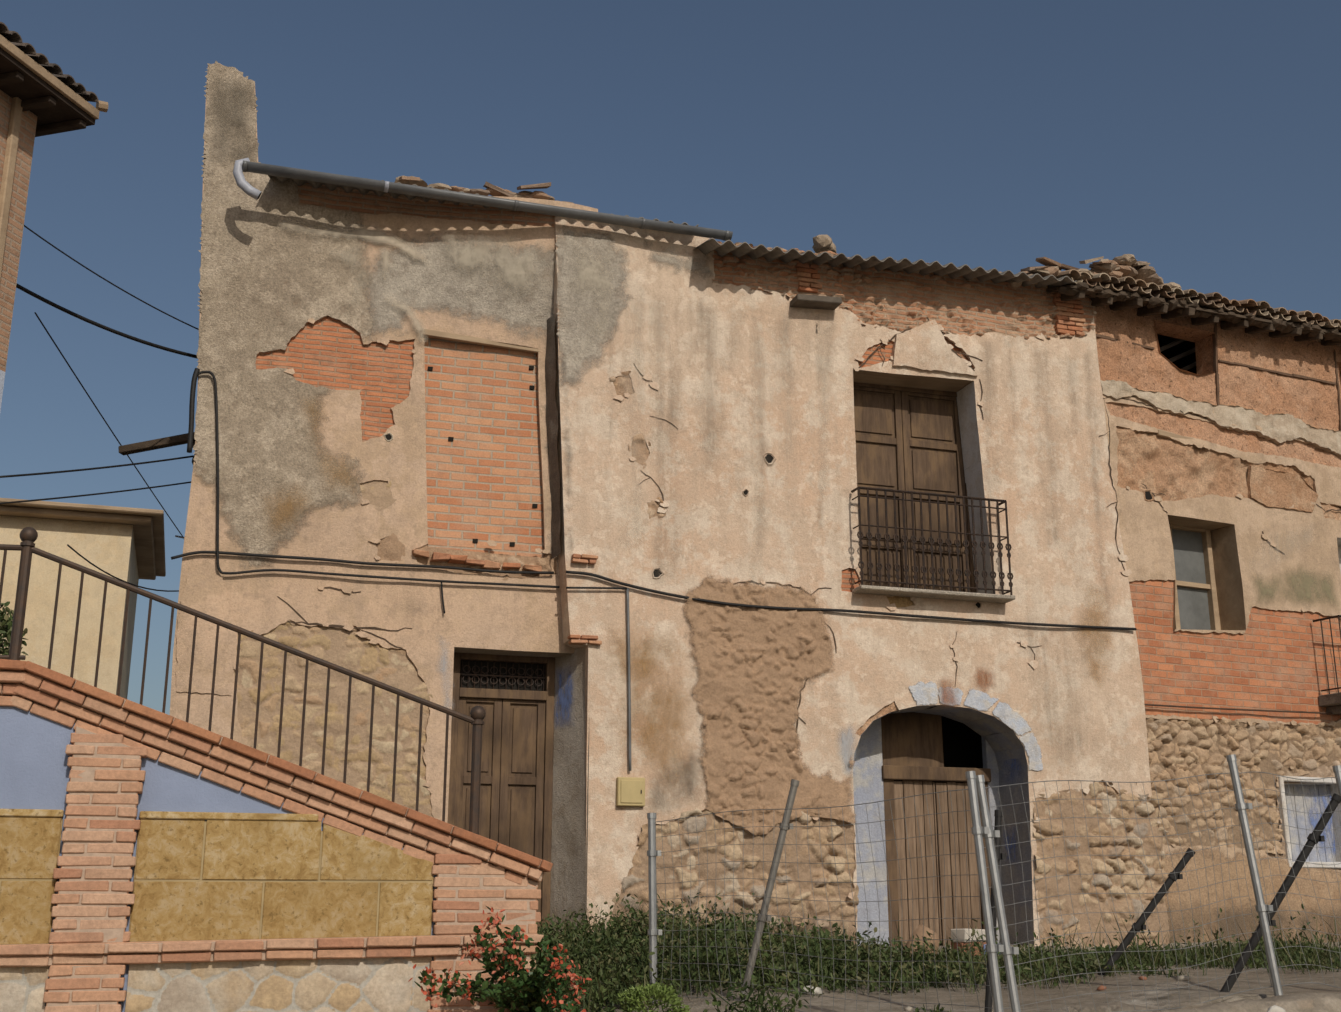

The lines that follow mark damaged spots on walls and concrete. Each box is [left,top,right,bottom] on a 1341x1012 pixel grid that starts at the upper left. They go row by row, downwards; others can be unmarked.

flaking render [193,61,555,566]
flaking render [711,241,1097,375]
crack [1099,398,1207,576]
flaking render [1103,395,1341,521]
crack [1262,531,1285,555]
flaking render [233,620,434,818]
crack [277,585,412,648]
flaking render [683,576,856,836]
flaking render [1129,580,1341,726]